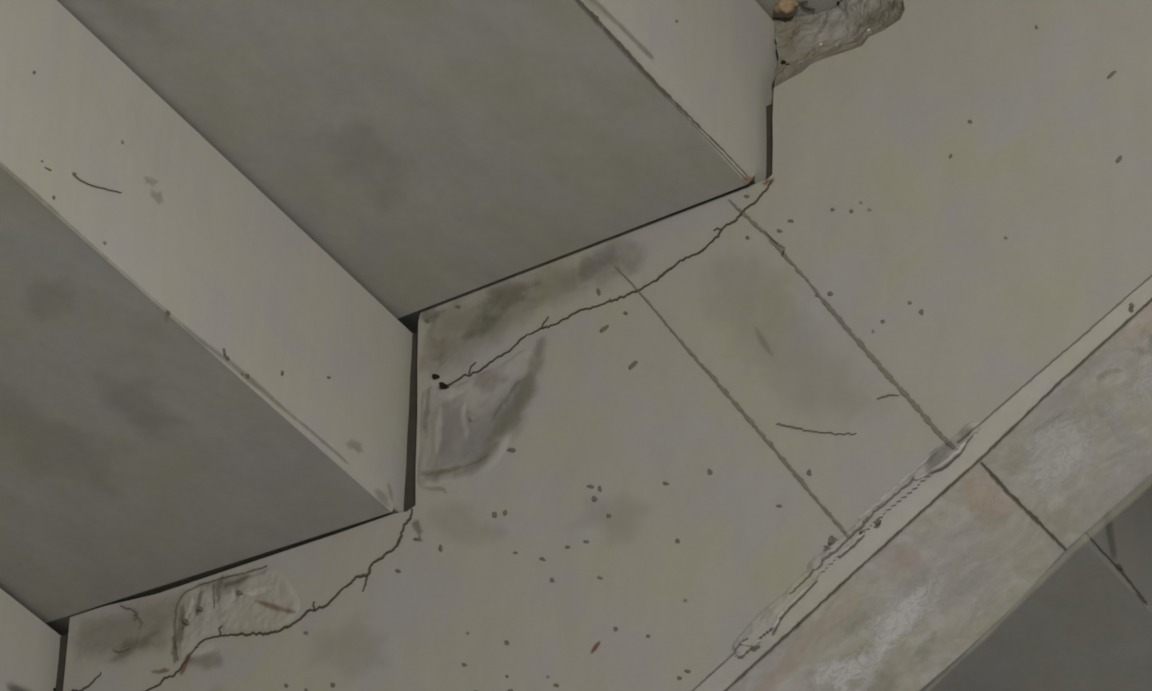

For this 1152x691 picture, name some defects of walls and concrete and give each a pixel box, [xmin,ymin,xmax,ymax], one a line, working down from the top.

spalling [774,0,905,87]
crack [447,180,772,386]
crack [71,605,143,691]
crack [145,508,413,691]